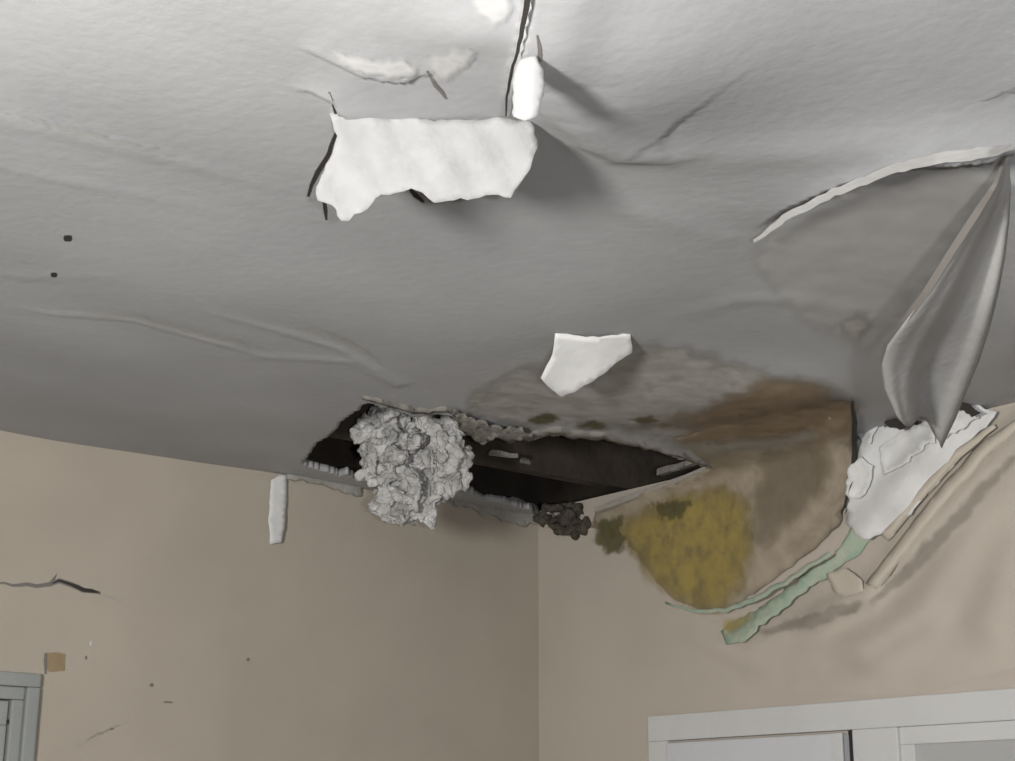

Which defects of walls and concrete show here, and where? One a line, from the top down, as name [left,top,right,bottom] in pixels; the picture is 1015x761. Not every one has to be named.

peeling [473,0,511,24]
peeling [335,49,474,99]
peeling [307,92,538,221]
flaking render [756,164,994,349]
spalling [363,333,772,469]
crack [0,574,124,602]
peeling [268,474,362,544]
water stain [595,487,750,609]